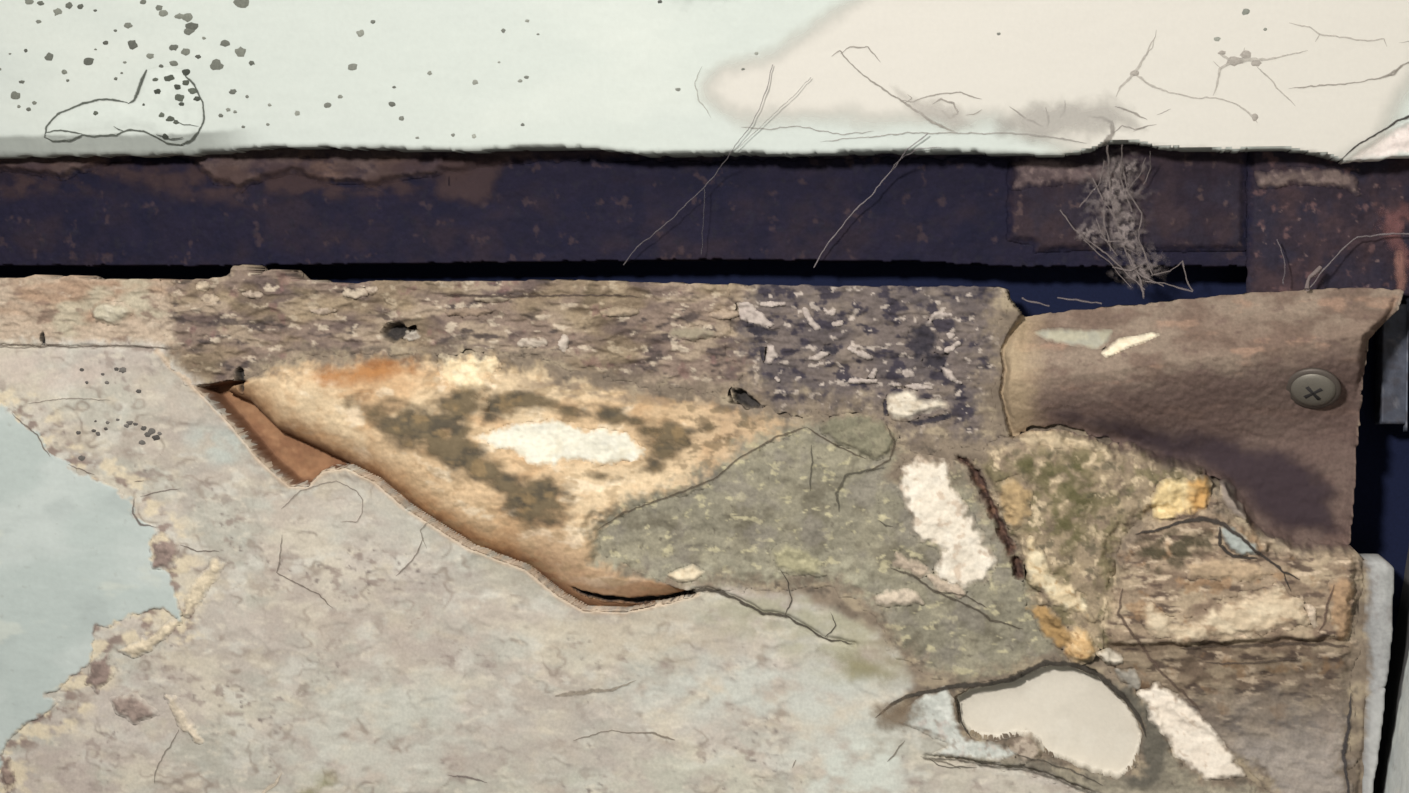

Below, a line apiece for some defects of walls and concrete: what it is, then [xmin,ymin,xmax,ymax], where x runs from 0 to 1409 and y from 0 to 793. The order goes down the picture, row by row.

leakage [25,0,97,24]
leakage [83,0,255,80]
leakage [11,80,37,111]
crack [743,23,1409,148]
crack [1341,115,1409,160]
rust [1385,207,1409,290]
leakage [347,389,694,525]
flaking render [0,265,1404,793]
crack [693,571,852,644]